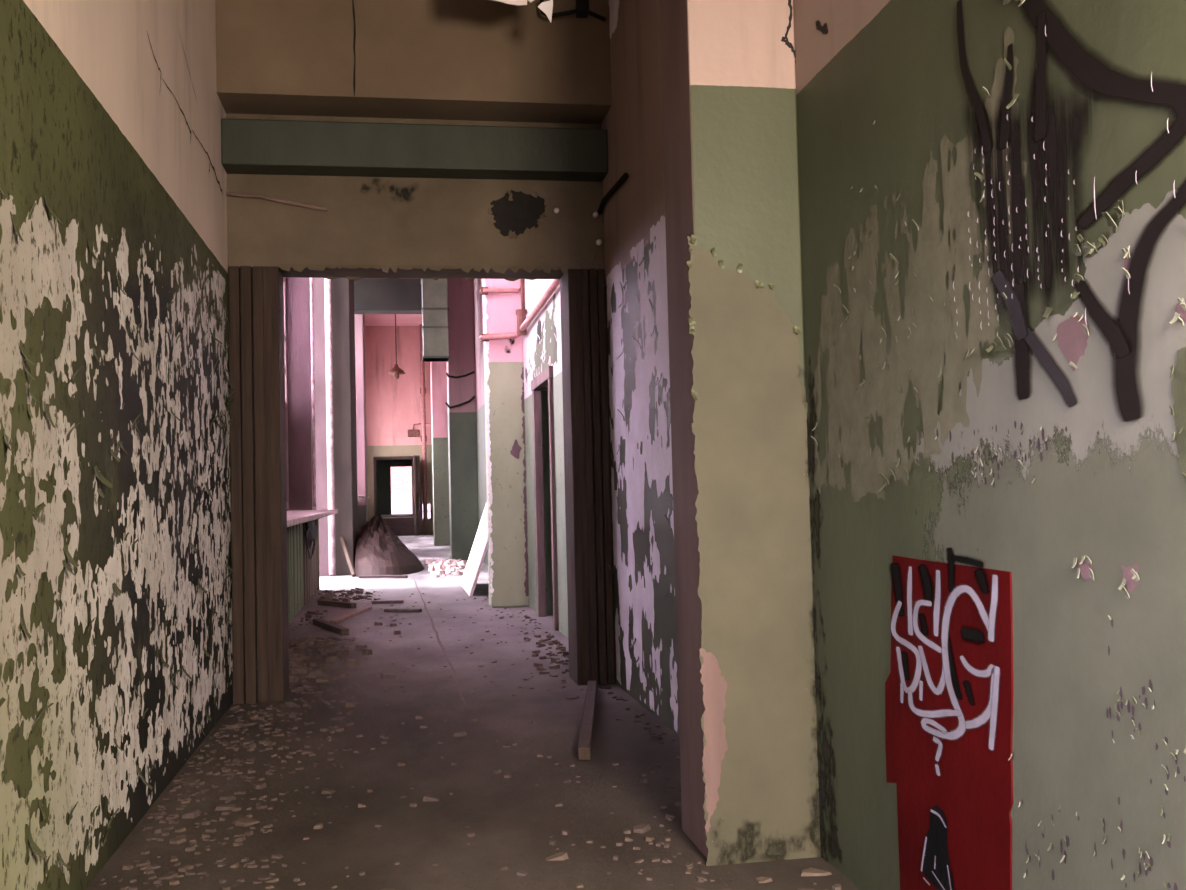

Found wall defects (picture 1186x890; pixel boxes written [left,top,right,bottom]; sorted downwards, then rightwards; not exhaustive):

crack [781,0,796,63]
peeling [0,185,236,890]
peeling [603,216,678,732]
peeling [687,27,1186,890]